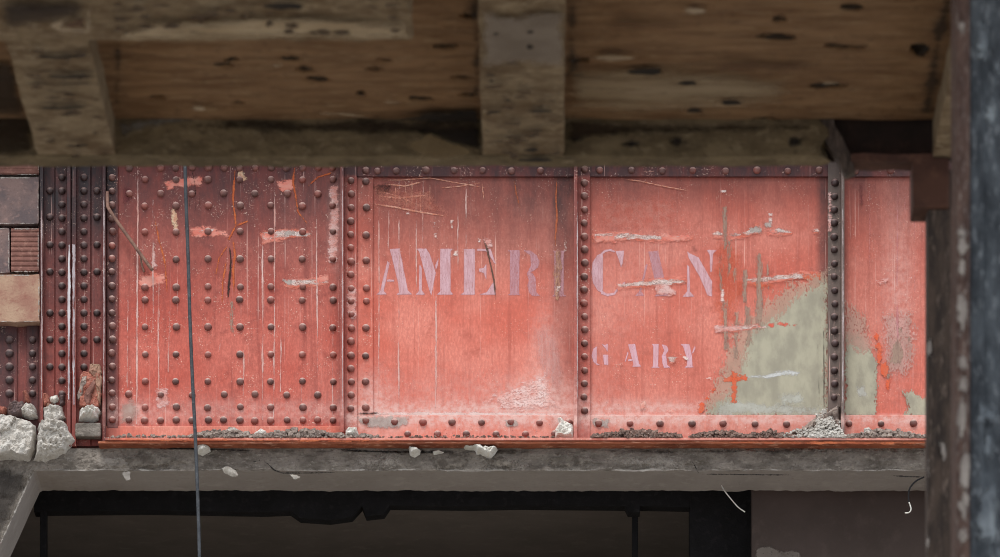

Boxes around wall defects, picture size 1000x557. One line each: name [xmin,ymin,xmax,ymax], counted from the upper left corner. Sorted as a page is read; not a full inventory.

spalling [67,240,105,409]
corrosion [216,172,248,304]
peeling [698,207,828,415]
peeling [842,274,932,415]